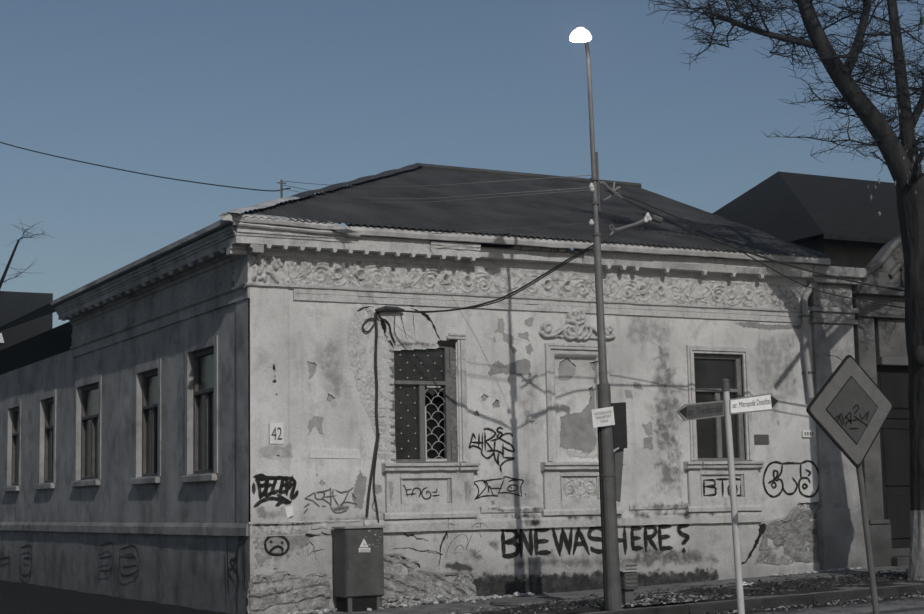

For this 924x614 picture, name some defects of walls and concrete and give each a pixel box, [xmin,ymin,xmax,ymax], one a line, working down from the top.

peeling [308,416,323,434]
spalling [347,308,459,463]
peeling [488,315,534,376]
peeling [558,357,576,381]
peeling [560,361,599,459]
leakage [657,349,678,446]
leakage [659,463,679,482]
spalling [755,501,819,566]
spalling [247,572,334,614]
spalling [382,555,477,603]